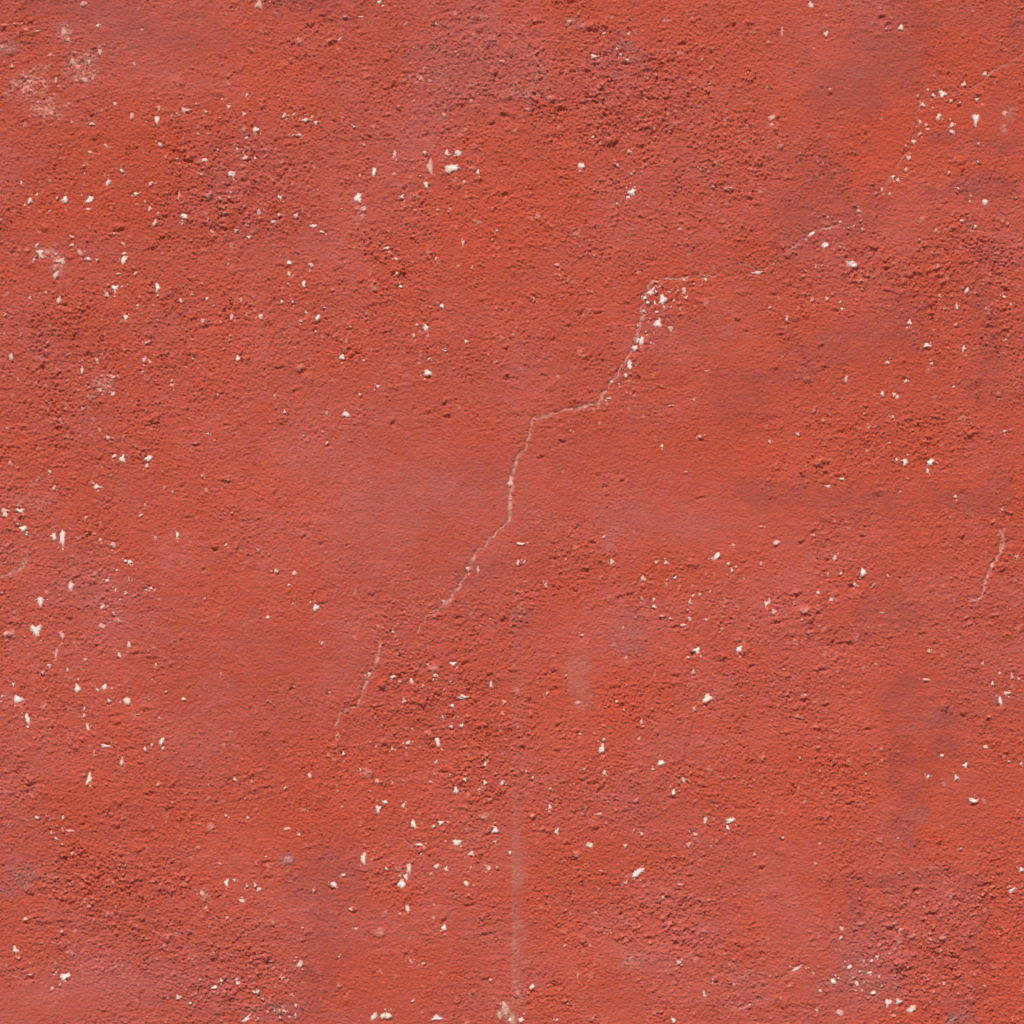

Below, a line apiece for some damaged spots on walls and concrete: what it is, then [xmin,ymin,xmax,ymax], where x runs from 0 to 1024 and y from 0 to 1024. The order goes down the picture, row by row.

crack [416,224,846,638]
crack [334,628,382,726]